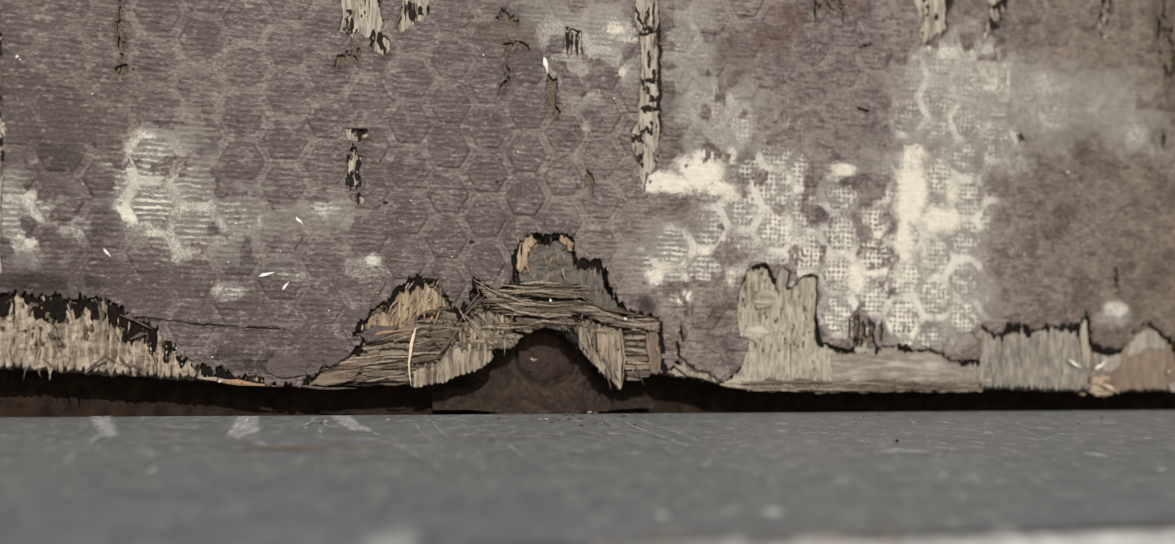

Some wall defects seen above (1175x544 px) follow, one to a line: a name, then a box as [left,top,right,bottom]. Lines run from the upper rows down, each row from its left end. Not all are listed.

peeling [339,0,432,55]
peeling [631,0,662,190]
crack [1156,0,1174,79]
crack [0,33,285,347]
damp [105,126,260,262]
damp [315,202,339,219]
crack [346,128,369,205]
damp [639,8,1071,349]
peeling [0,290,308,387]
damp [212,285,247,301]
crack [353,233,887,389]
peeling [727,263,1175,394]